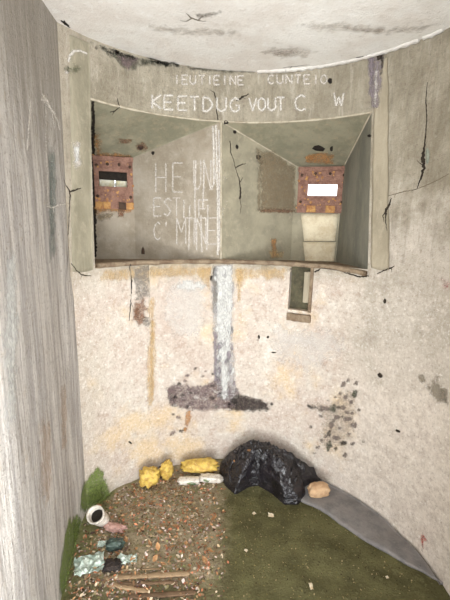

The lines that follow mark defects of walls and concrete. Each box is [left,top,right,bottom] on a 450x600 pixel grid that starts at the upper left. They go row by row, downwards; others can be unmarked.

water stain [102,47,179,69]
water stain [368,55,383,108]
crack [229,141,246,212]
crack [382,82,448,229]
water stain [166,265,273,419]